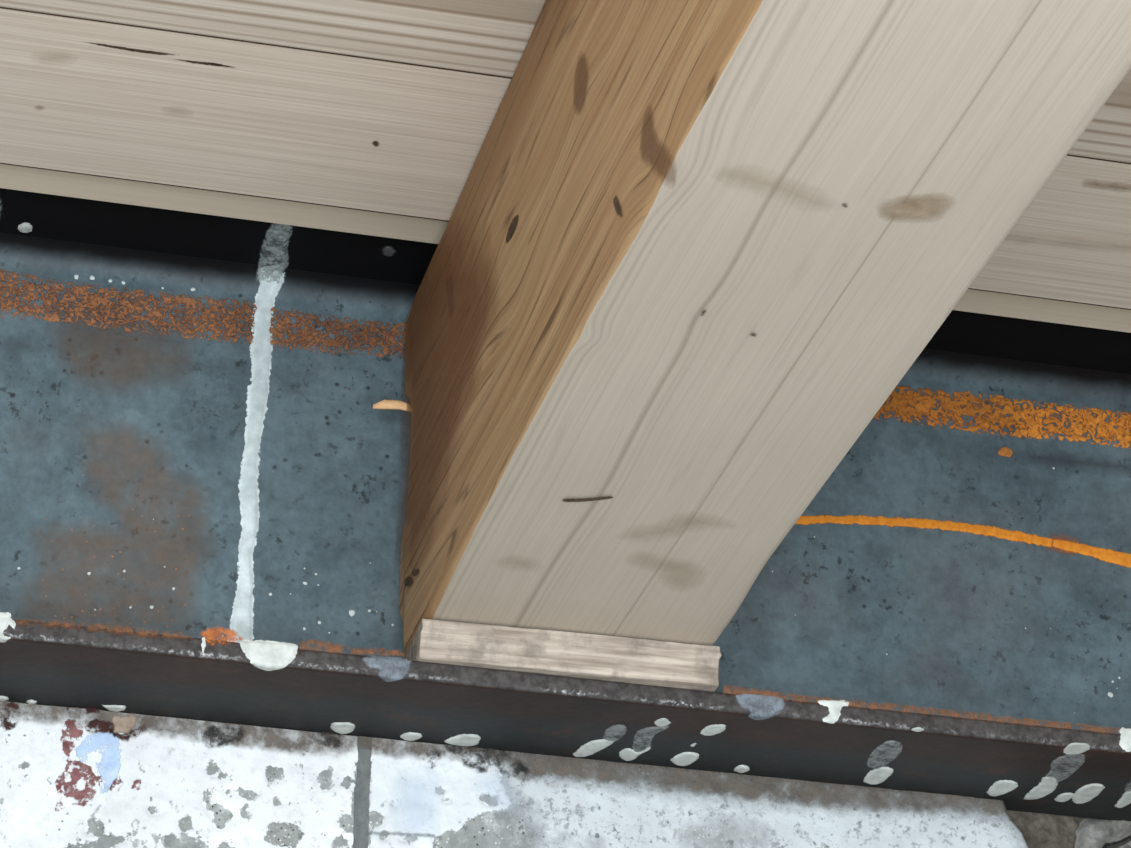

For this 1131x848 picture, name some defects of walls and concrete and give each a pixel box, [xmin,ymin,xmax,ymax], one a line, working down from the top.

corrosion [0,269,257,344]
corrosion [269,307,407,358]
corrosion [873,386,1131,457]
corrosion [18,620,242,646]
corrosion [299,639,404,656]
corrosion [724,685,1120,734]
peeling [0,704,512,848]